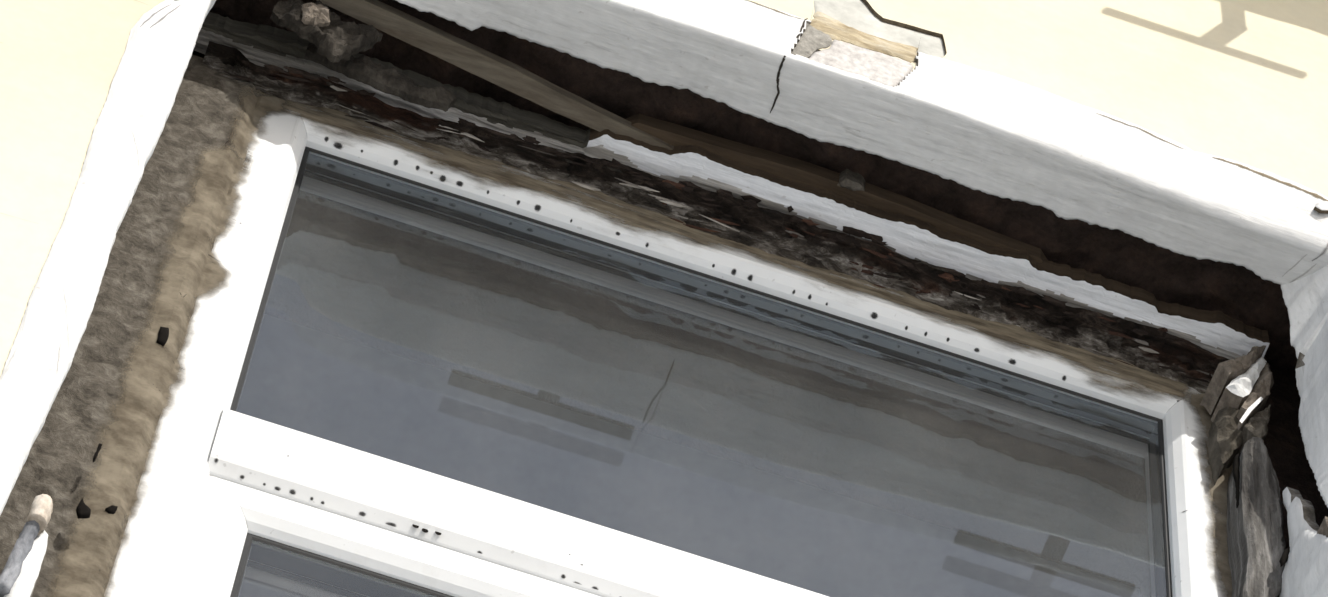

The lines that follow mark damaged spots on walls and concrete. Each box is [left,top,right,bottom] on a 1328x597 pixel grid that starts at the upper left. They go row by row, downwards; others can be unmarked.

crack [770,18,808,113]
flaking render [748,0,945,87]
leakage [48,88,1233,597]
flaking render [1200,345,1274,485]